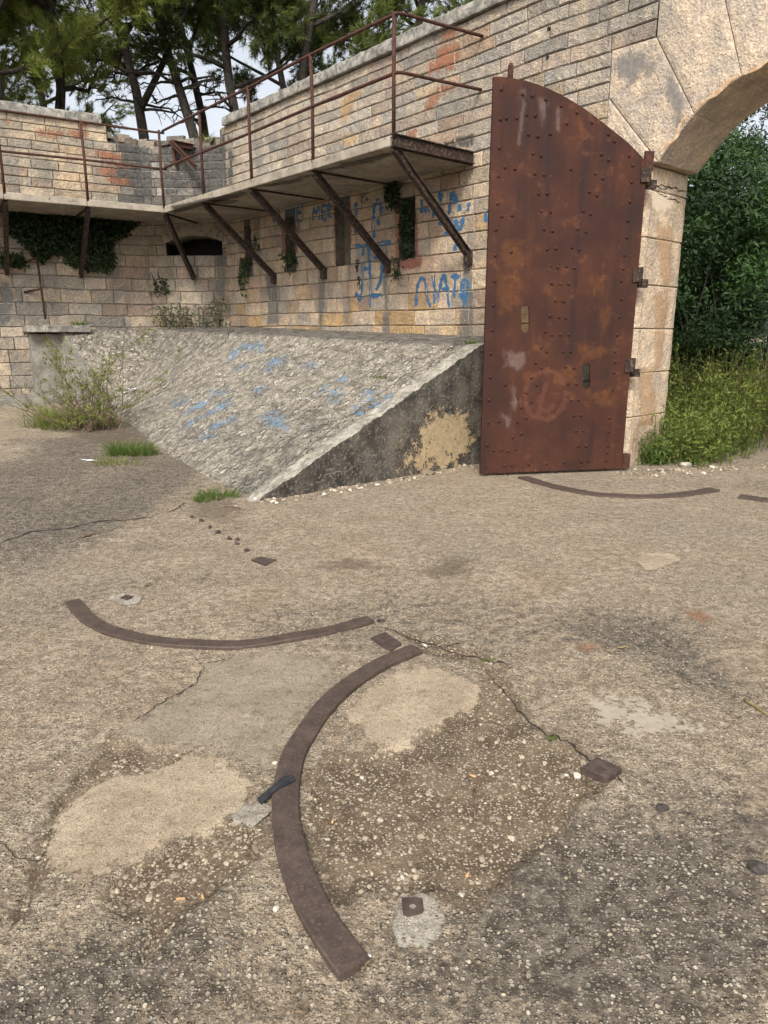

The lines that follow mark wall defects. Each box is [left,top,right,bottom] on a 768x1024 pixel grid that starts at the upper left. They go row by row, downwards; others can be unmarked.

corrosion [425,29,464,116]
peeling [390,402,481,476]
crack [2,503,184,542]
crack [133,657,232,722]
crack [382,627,591,762]